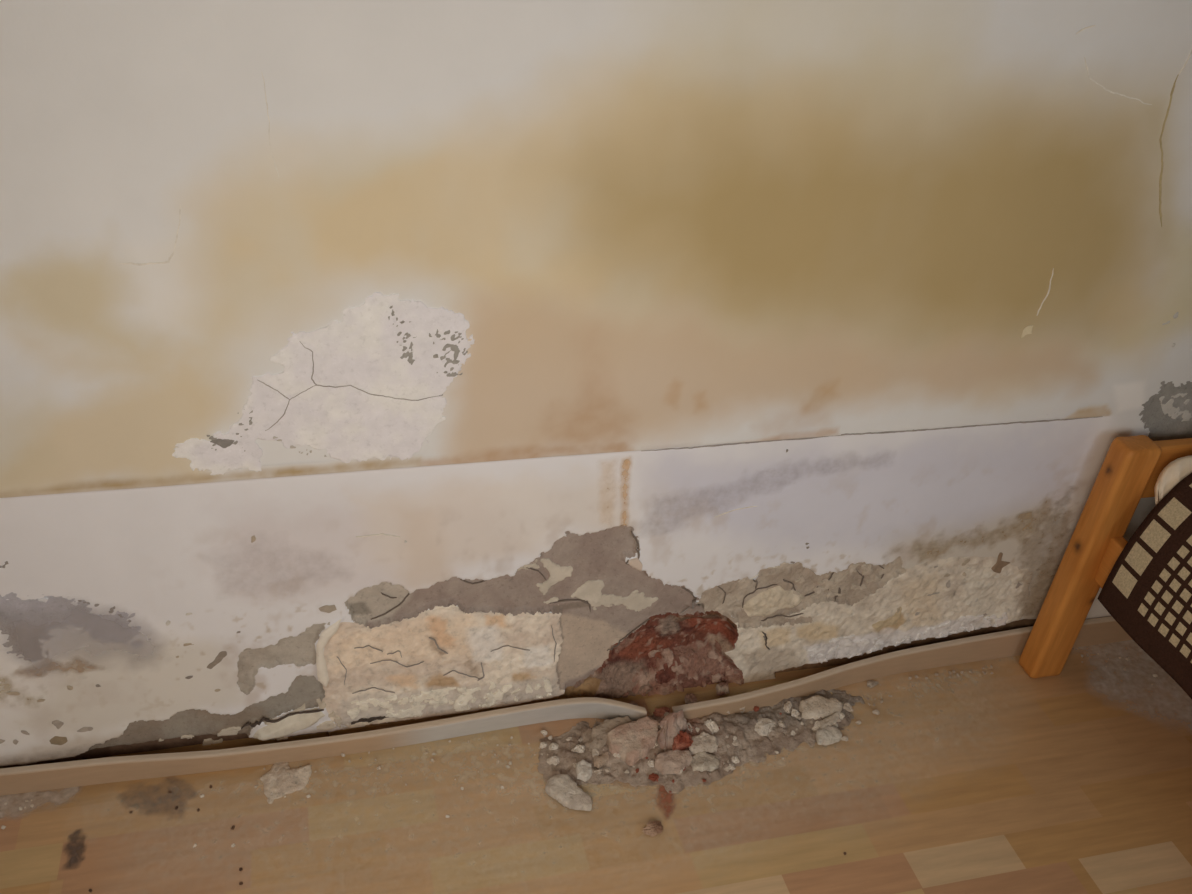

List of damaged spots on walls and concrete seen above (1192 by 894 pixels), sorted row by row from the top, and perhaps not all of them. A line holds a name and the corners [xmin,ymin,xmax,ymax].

crack [1076,25,1192,227]
water stain [0,0,1192,498]
peeling [172,292,475,475]
crack [258,342,442,431]
peeling [1139,381,1192,441]
peeling [991,553,1010,573]
peeling [0,592,151,662]
spalling [81,525,906,754]
peeling [50,720,93,745]
peeling [607,716,718,775]